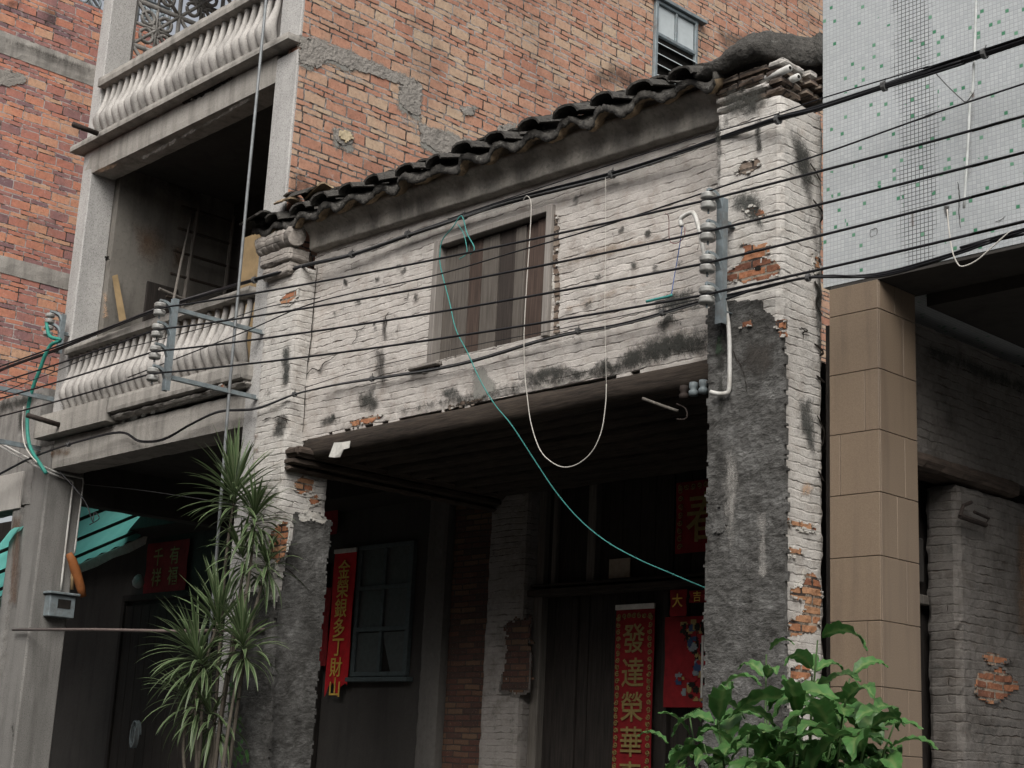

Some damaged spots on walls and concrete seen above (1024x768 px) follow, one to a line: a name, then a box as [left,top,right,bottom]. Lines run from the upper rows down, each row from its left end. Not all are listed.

spalling [733,158,762,175]
water stain [792,130,814,197]
spalling [741,203,765,218]
spalling [727,241,780,284]
water stain [418,288,727,412]
spalling [350,414,383,426]
water stain [798,398,815,451]
peeling [269,476,327,600]
spalling [787,518,817,534]
peeling [788,569,824,637]
peeling [498,616,535,697]
peeling [974,652,1019,704]